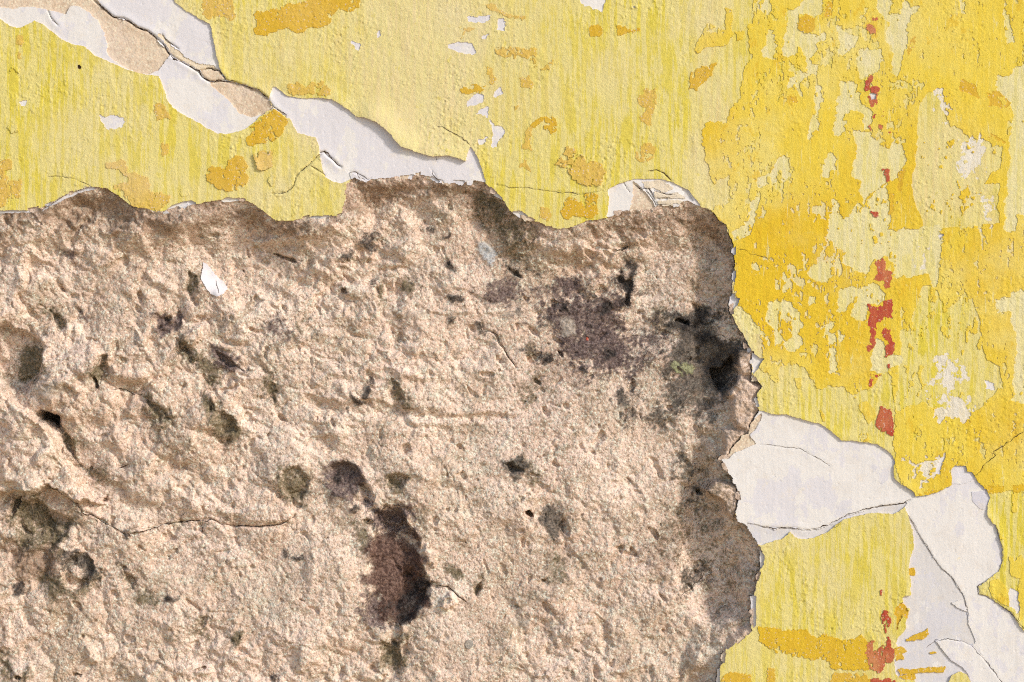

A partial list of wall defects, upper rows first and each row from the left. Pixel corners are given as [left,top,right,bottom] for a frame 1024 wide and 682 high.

water stain [4,192,315,235]
peeling [0,0,486,184]
water stain [346,177,539,240]
peeling [467,93,505,148]
peeling [753,0,944,374]
peeling [952,132,987,179]
peeling [978,65,1024,233]
water stain [447,207,749,433]
spalling [0,172,1024,682]
crack [49,488,295,534]
water stain [322,459,417,535]
water stain [353,577,433,635]